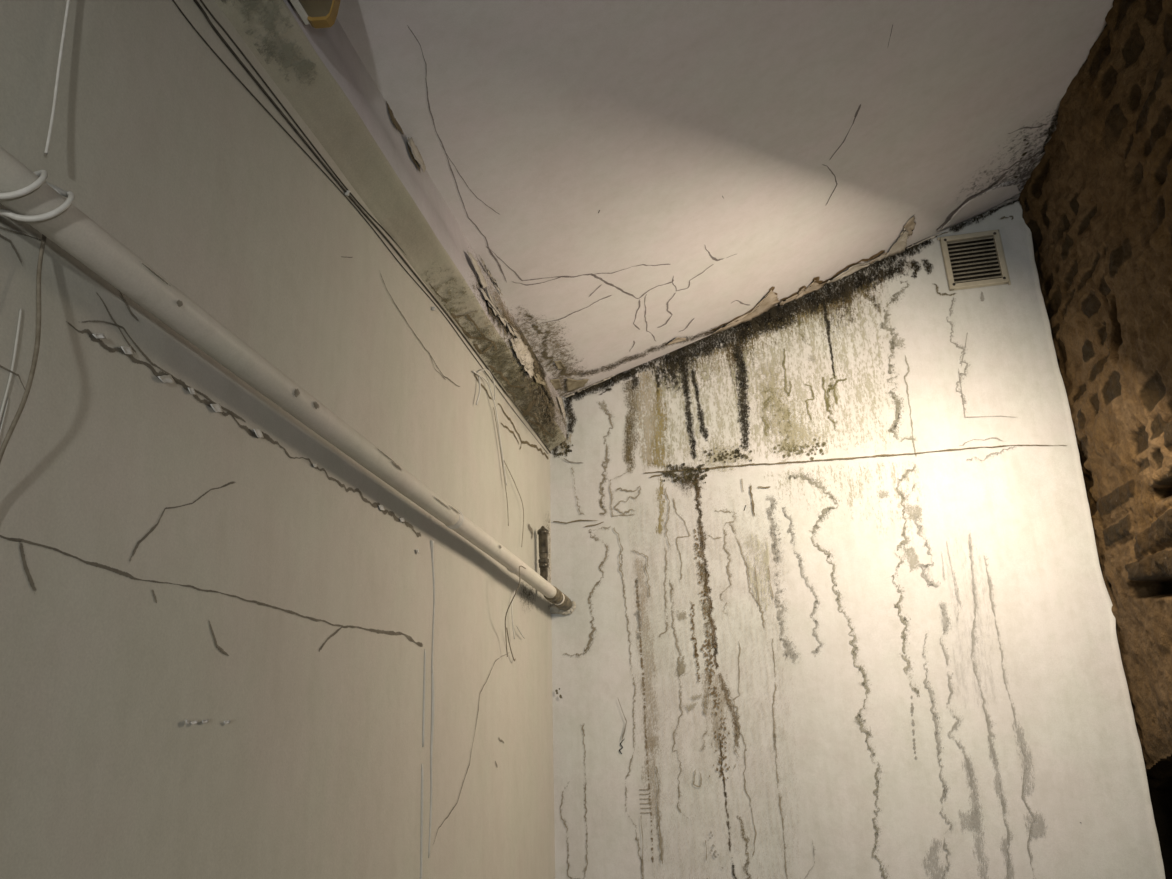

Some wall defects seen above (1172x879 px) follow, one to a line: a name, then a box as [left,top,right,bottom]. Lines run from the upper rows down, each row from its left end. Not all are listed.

crack [0,227,40,266]
crack [407,25,736,350]
flaking render [713,216,949,334]
crack [824,105,861,204]
leakage [949,98,1062,232]
crack [380,273,582,463]
crack [0,482,423,656]
crack [553,519,603,527]
leakage [426,238,1045,879]